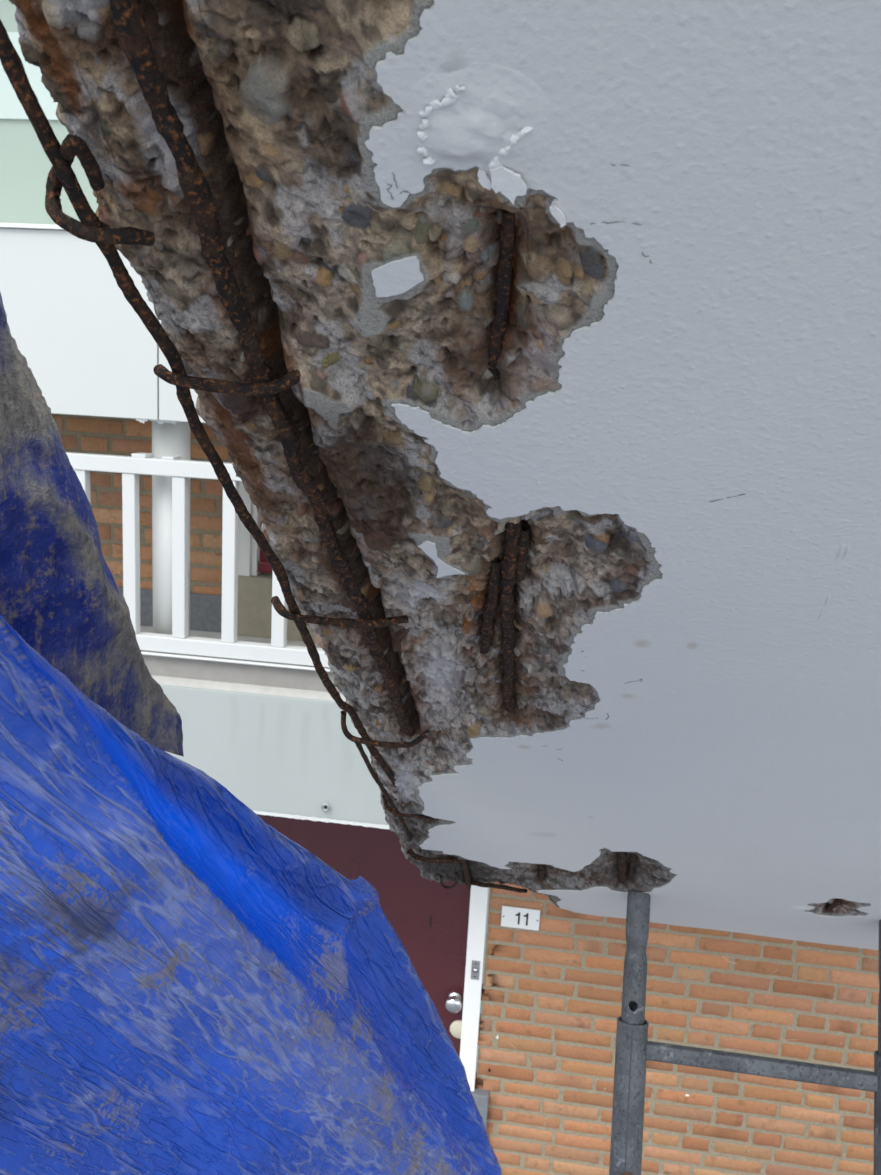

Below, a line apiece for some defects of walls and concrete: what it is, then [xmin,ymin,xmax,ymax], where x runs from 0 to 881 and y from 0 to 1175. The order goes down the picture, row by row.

spalling [9,0,77,135]
corrosion [12,0,178,222]
spalling [76,30,143,175]
corrosion [150,0,212,83]
spalling [92,186,239,369]
corrosion [486,202,529,383]
corrosion [166,315,287,529]
spalling [137,0,662,851]
corrosion [253,303,451,737]
spalling [504,848,615,909]
spalling [629,852,677,892]
spalling [805,898,870,916]